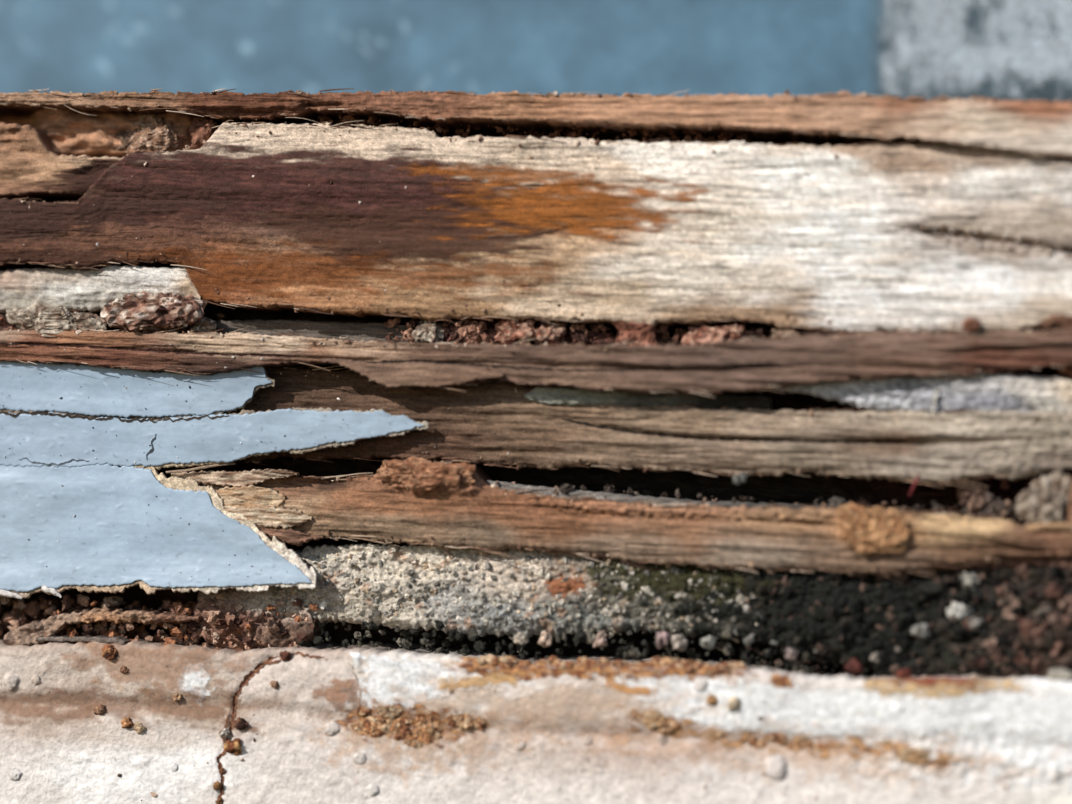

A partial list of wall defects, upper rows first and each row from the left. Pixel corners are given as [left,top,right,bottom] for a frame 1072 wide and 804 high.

crack [896,214,992,238]
peeling [0,361,429,599]
water stain [588,555,995,664]
crack [213,650,361,804]
corrosion [313,679,491,749]
corrosion [440,654,749,695]
corrosion [771,673,793,688]
corrosion [620,706,970,770]